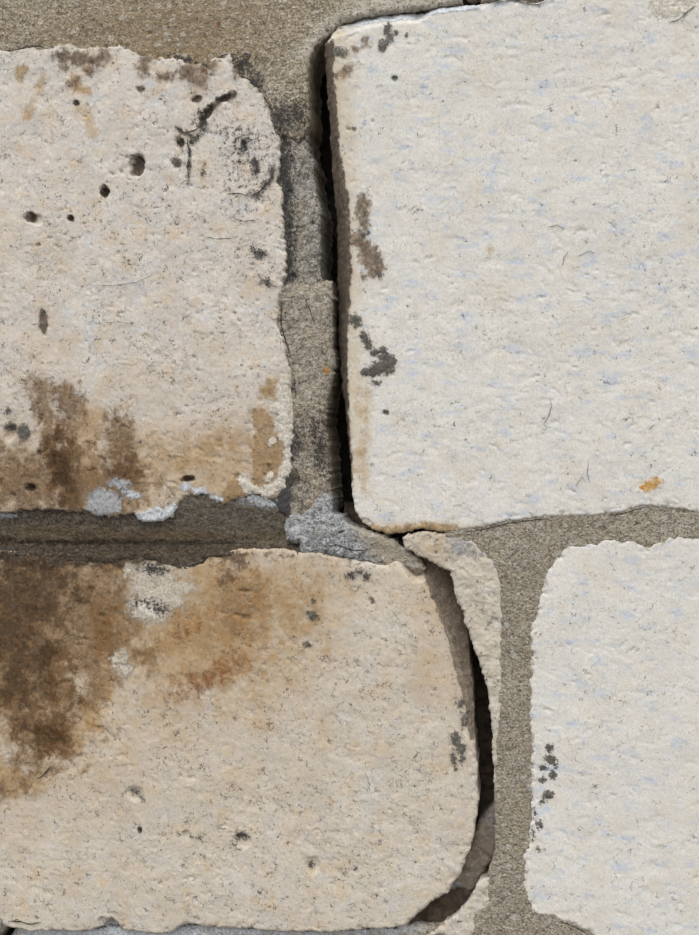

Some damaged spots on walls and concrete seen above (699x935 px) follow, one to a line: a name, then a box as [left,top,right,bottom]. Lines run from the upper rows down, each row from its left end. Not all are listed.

crack [229,139,274,197]
crack [319,73,338,286]
crack [207,218,292,358]
damp [87,477,143,516]
damp [135,503,178,522]
damp [180,482,223,502]
damp [236,494,280,510]
crack [324,390,371,551]
crack [393,518,546,542]
damp [212,553,272,639]
crack [471,640,494,825]
crack [349,887,471,931]